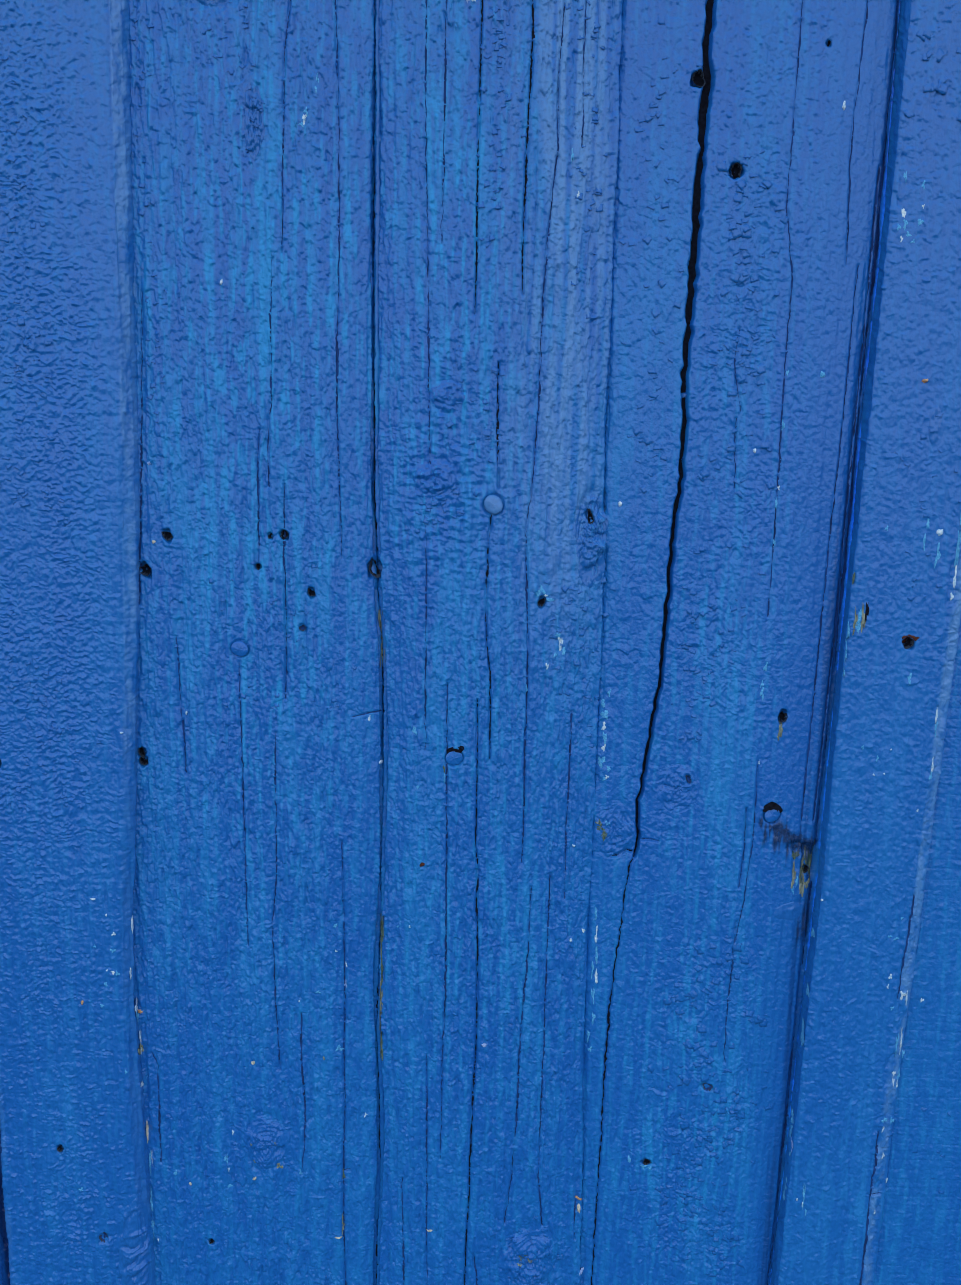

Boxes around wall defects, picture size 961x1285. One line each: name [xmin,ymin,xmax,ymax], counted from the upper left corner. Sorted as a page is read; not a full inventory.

crack [424,0,447,464]
crack [401,515,492,1285]
crack [474,0,483,307]
crack [493,363,501,466]
crack [504,0,587,1224]
crack [574,0,714,1285]